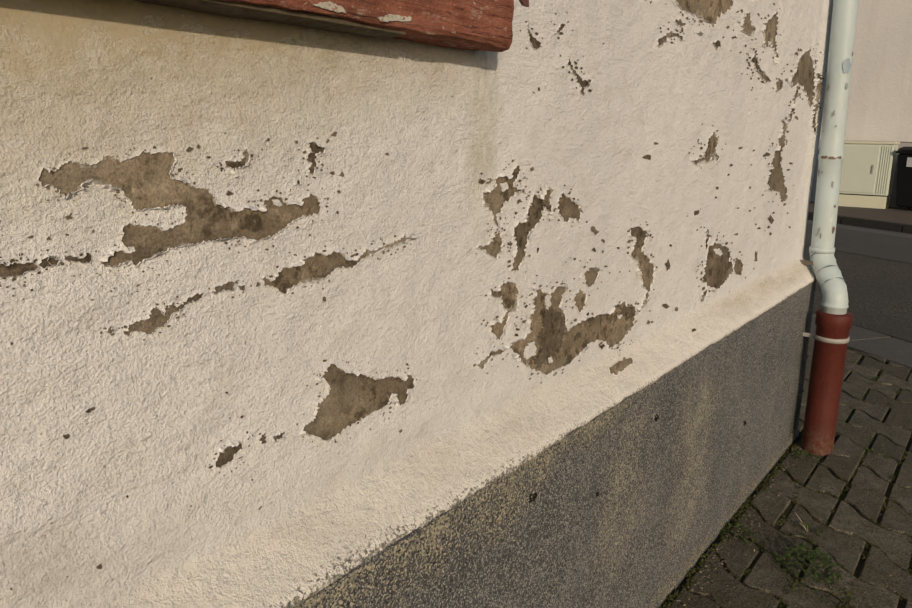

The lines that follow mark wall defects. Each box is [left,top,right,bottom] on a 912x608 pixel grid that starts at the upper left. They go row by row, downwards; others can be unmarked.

peeling [657,0,827,134]
peeling [688,124,726,169]
peeling [0,132,344,297]
peeling [100,233,417,341]
peeling [473,160,670,383]
peeling [696,226,758,302]
peeling [205,360,417,476]